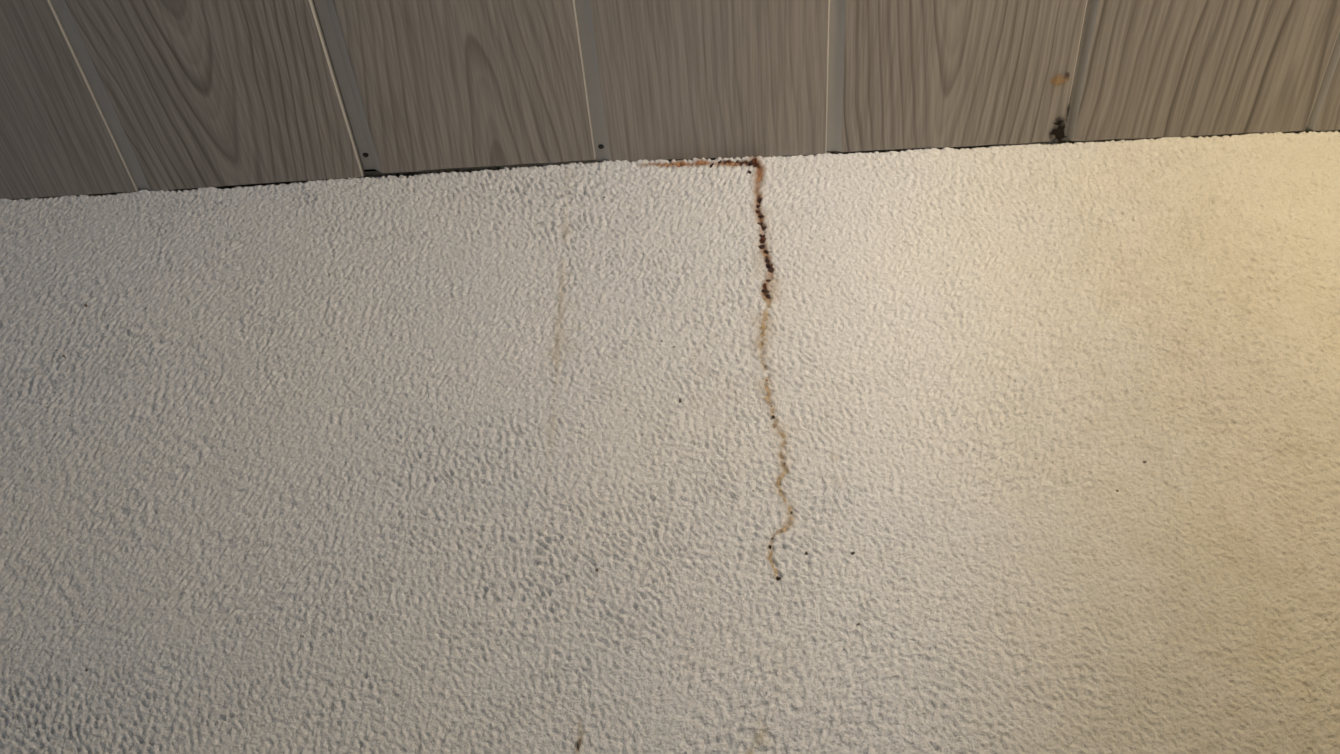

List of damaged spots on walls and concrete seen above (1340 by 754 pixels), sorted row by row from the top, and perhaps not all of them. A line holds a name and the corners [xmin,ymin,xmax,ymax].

crack [747,158,793,580]